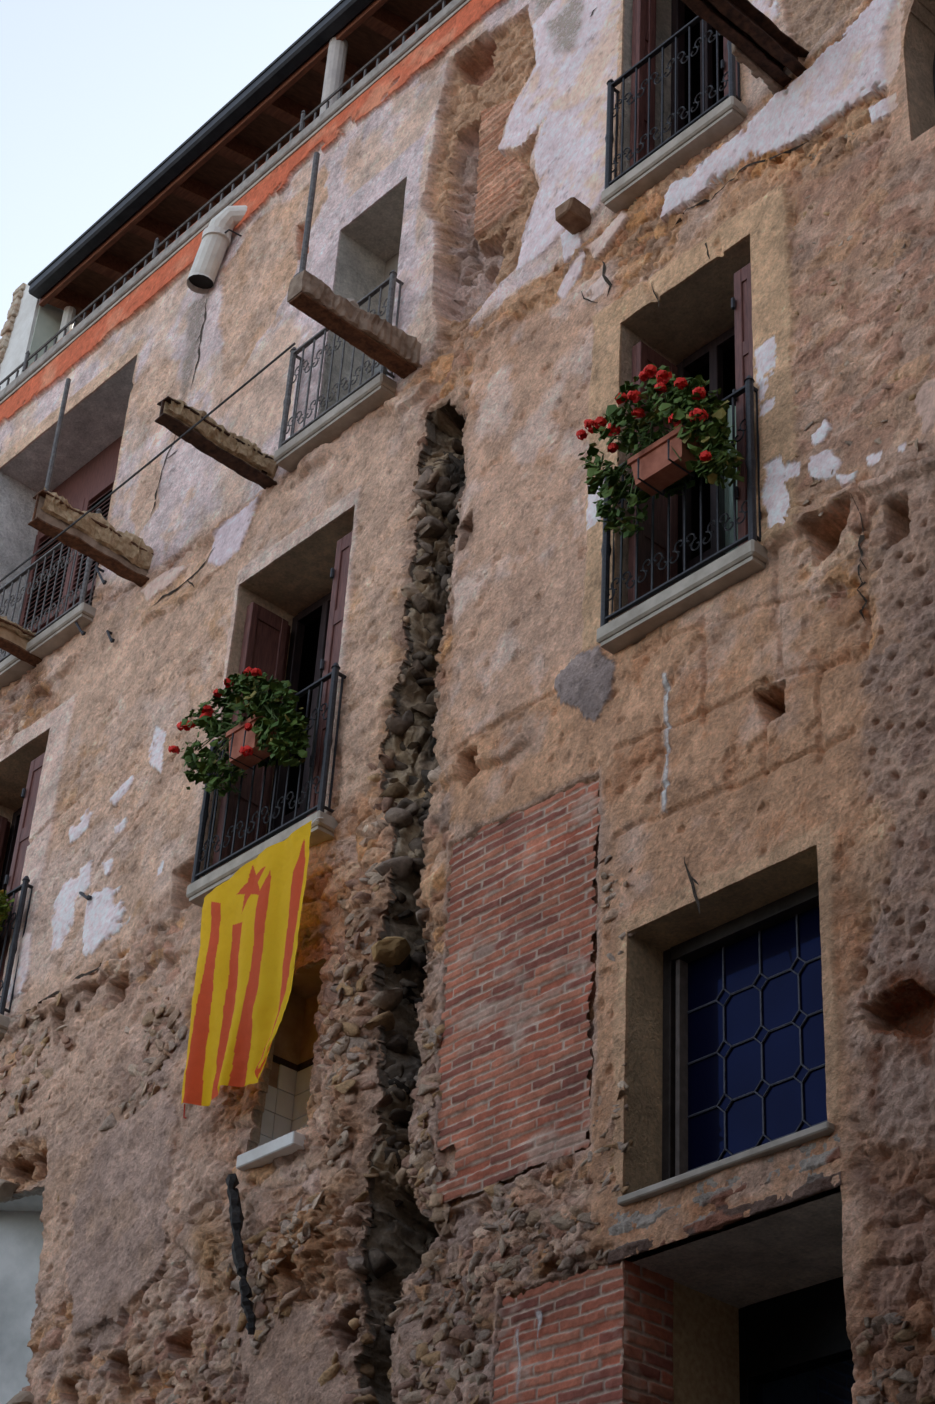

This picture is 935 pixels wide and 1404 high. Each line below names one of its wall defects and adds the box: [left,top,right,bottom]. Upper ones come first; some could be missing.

spalling [420,0,629,350]
peeling [660,0,906,218]
crack [331,402,474,1404]